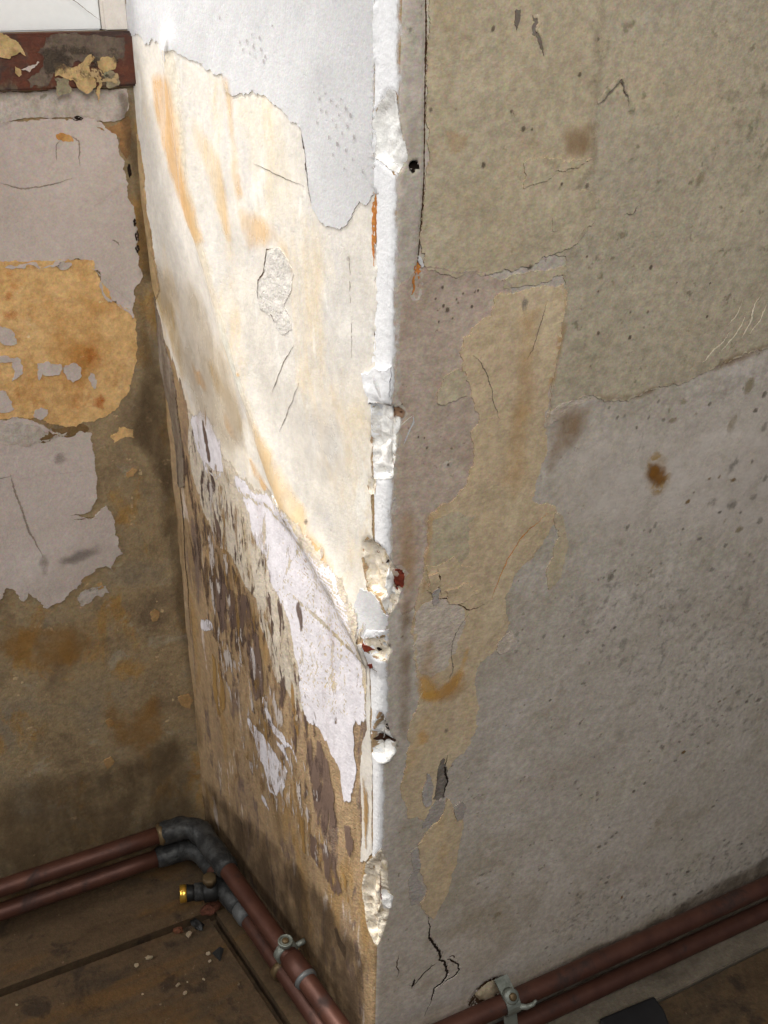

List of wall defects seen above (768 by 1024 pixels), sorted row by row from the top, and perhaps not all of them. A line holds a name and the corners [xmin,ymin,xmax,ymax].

water stain [165,83,197,240]
peeling [0,33,143,609]
peeling [126,0,768,946]
corrosion [646,455,667,492]
water stain [182,298,368,903]
water stain [205,793,360,1024]
crack [396,916,462,1015]